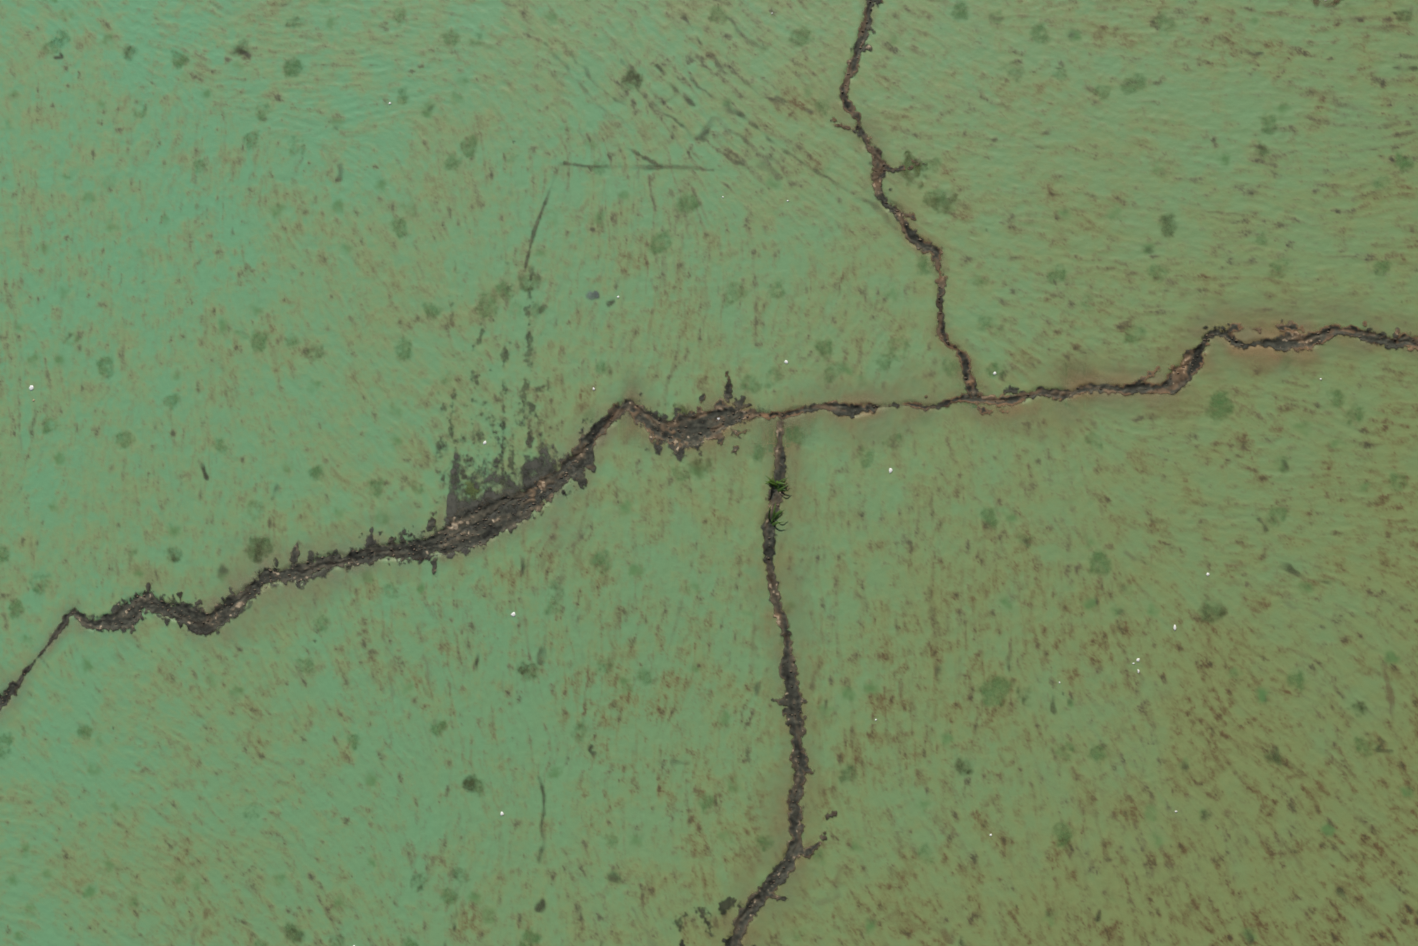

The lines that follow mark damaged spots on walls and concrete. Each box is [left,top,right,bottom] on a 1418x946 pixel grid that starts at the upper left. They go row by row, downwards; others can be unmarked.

crack [525,201,546,267]
crack [830,0,1418,415]
crack [0,371,880,946]